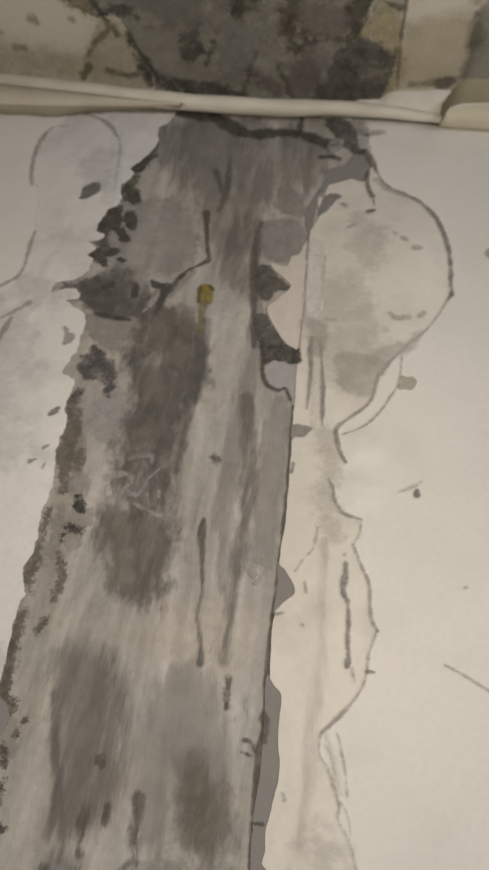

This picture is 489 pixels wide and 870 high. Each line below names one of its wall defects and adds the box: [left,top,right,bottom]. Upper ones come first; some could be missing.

damp [62,0,121,80]
peeling [0,111,377,870]